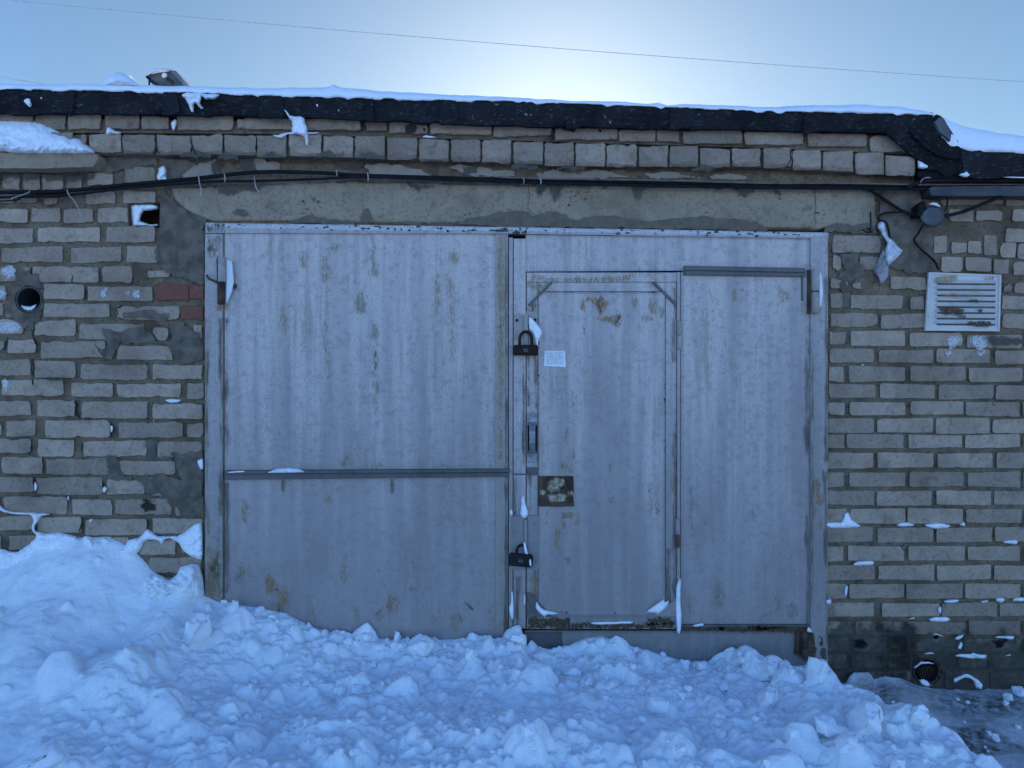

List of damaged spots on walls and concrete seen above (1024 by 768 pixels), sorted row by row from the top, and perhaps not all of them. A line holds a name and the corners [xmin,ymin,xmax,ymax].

flaking render [249,151,283,171]
flaking render [356,152,431,176]
flaking render [450,163,628,179]
flaking render [645,171,747,180]
spalling [204,191,877,270]
corrosion [528,275,627,326]
corrosion [488,575,827,659]
damp [828,620,1024,690]